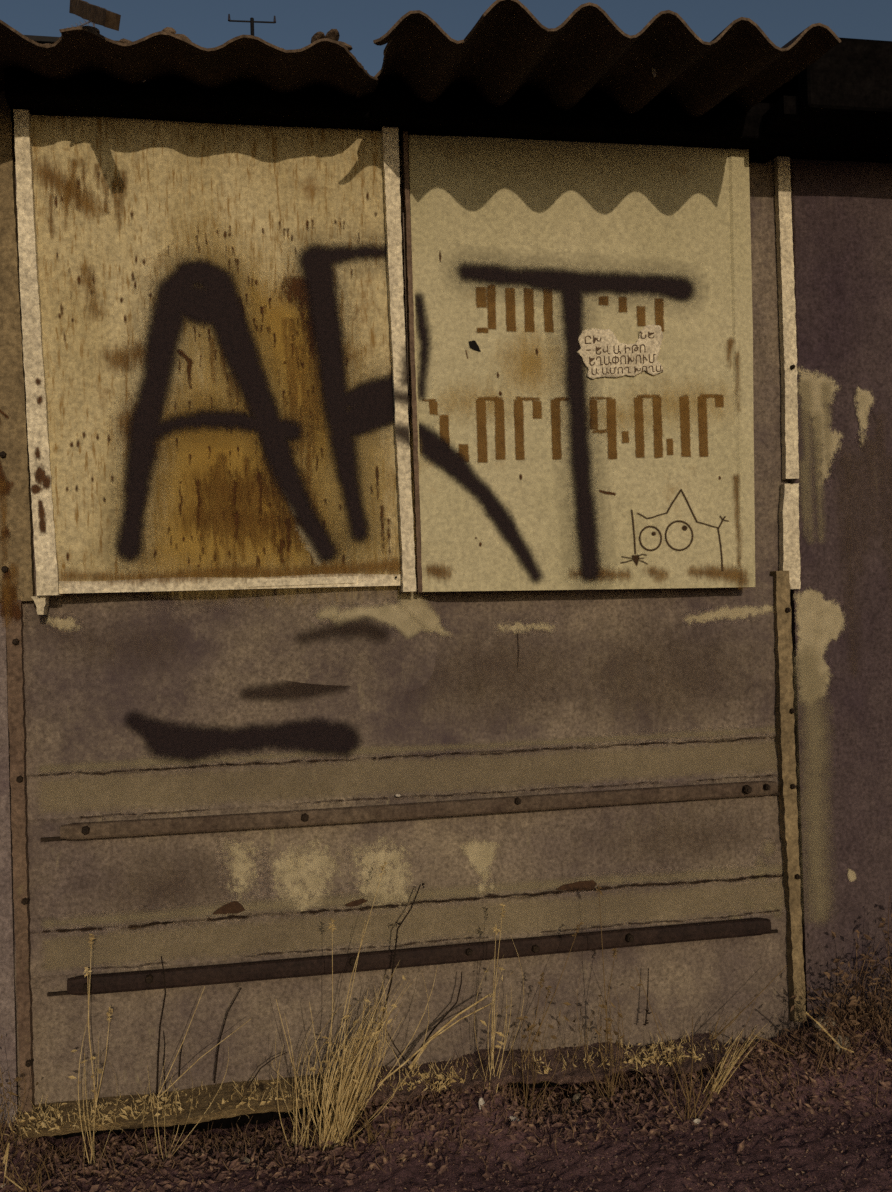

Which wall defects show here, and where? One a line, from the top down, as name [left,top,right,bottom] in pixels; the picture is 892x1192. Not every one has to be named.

flaking render [798,369,843,508]